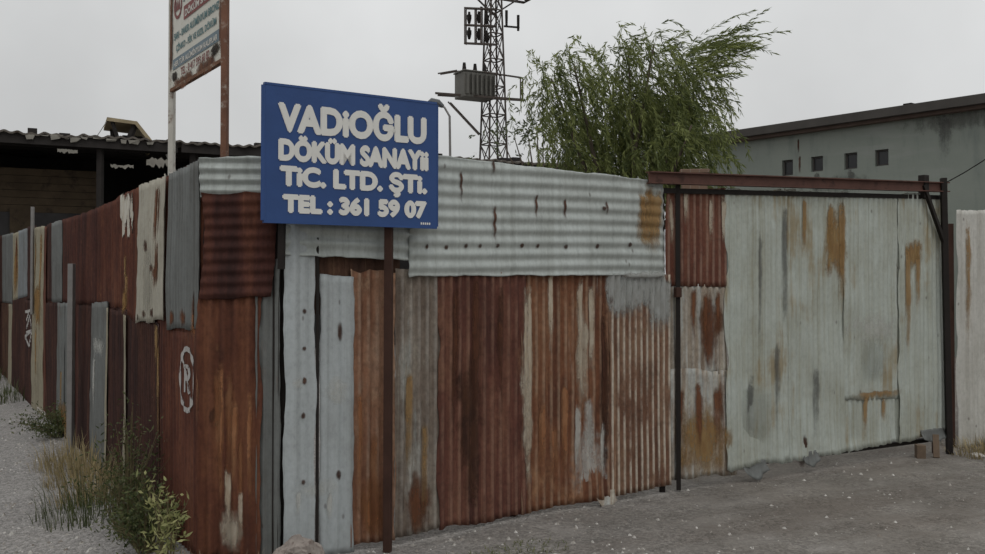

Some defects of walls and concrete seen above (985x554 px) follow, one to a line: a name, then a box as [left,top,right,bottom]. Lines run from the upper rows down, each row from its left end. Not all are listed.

peeling [120,192,133,237]
rust [144,189,160,281]
rust [629,191,662,247]
rust [826,203,846,280]
rust [905,241,921,320]
rust [691,291,723,365]
rust [215,369,252,492]
rust [452,279,480,497]
rust [600,306,609,458]
rust [681,382,732,473]
rust [860,390,897,423]